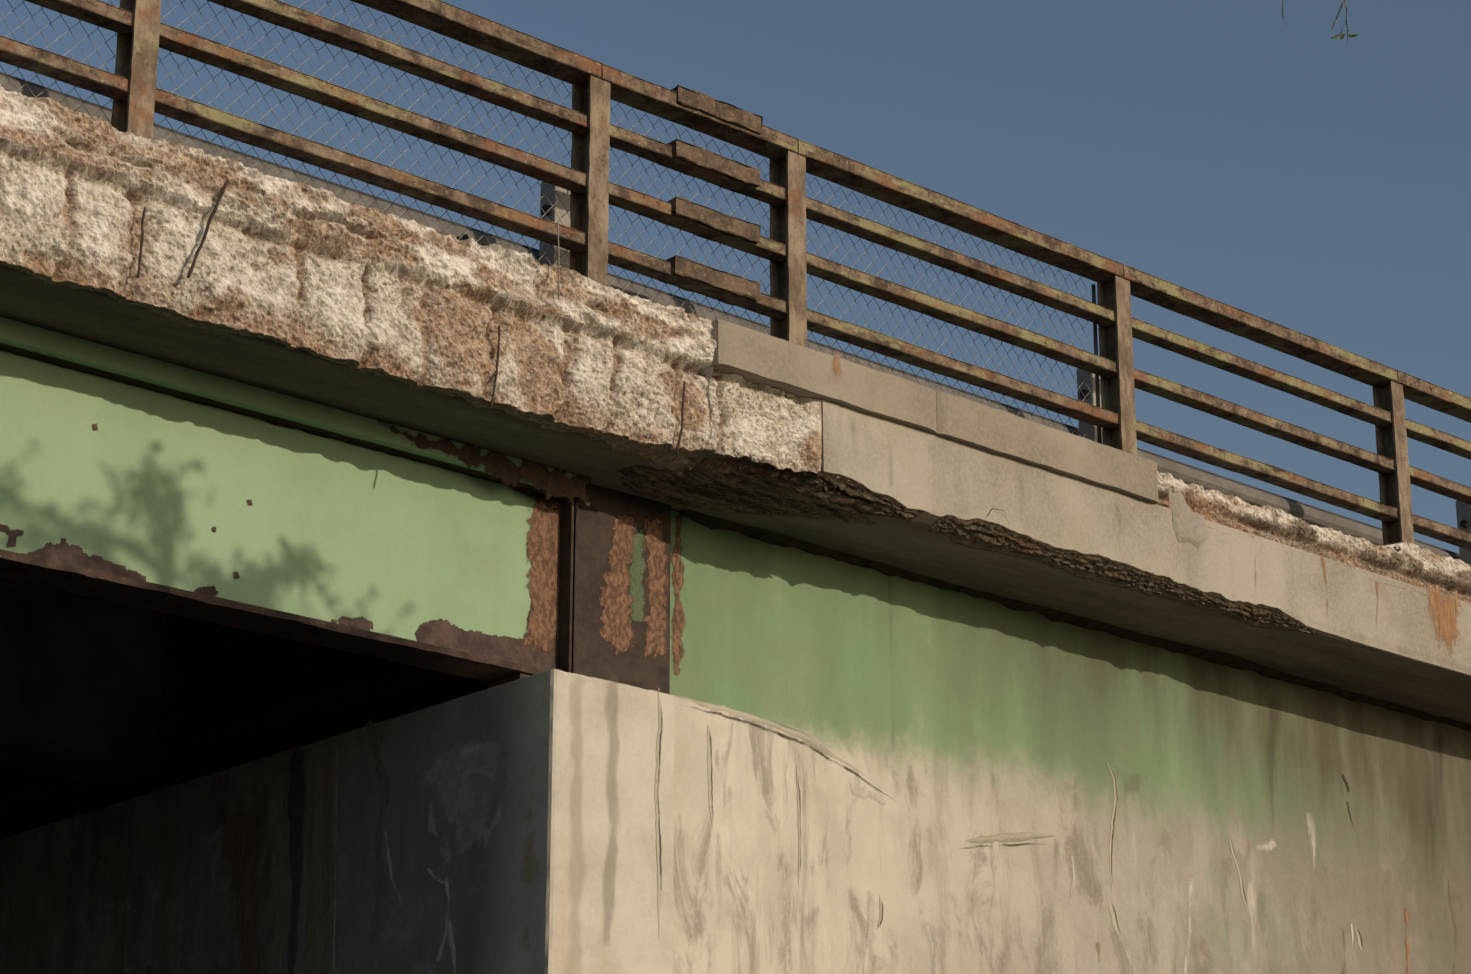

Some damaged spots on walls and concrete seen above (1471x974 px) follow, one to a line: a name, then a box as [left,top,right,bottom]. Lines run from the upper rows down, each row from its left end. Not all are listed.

spalling [0,84,1320,635]
corrosion [0,343,591,662]
corrosion [599,513,685,674]
spalling [1157,471,1471,606]
corrosion [1429,585,1458,651]
leakage [288,751,305,974]
crack [794,763,802,872]
crack [866,895,883,946]
crack [1107,763,1136,974]
crack [1228,837,1276,918]